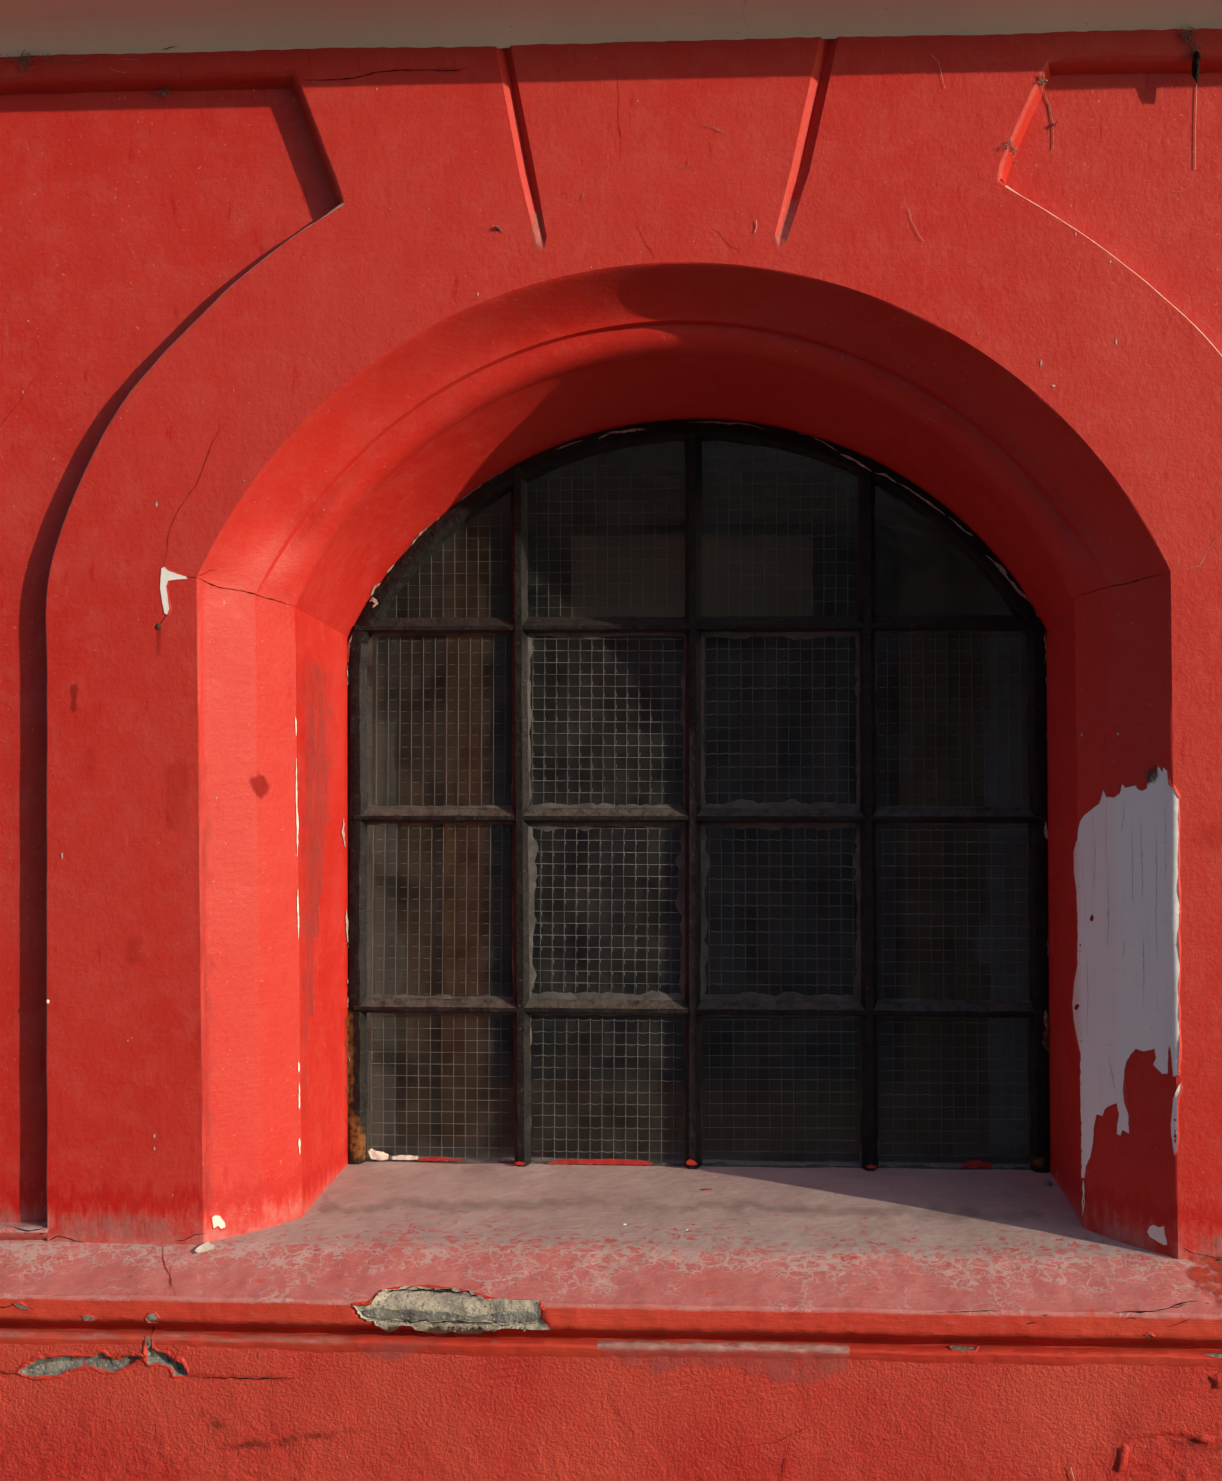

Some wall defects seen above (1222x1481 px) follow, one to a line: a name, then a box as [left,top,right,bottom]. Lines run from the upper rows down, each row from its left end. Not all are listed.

crack [301,68,465,80]
crack [164,418,295,606]
peeling [797,433,973,536]
peeling [370,518,439,607]
peeling [986,555,1047,685]
peeling [1071,764,1183,1216]
peeling [15,1311,190,1381]
spalling [351,1285,550,1334]
peeling [1189,1256,1222,1303]